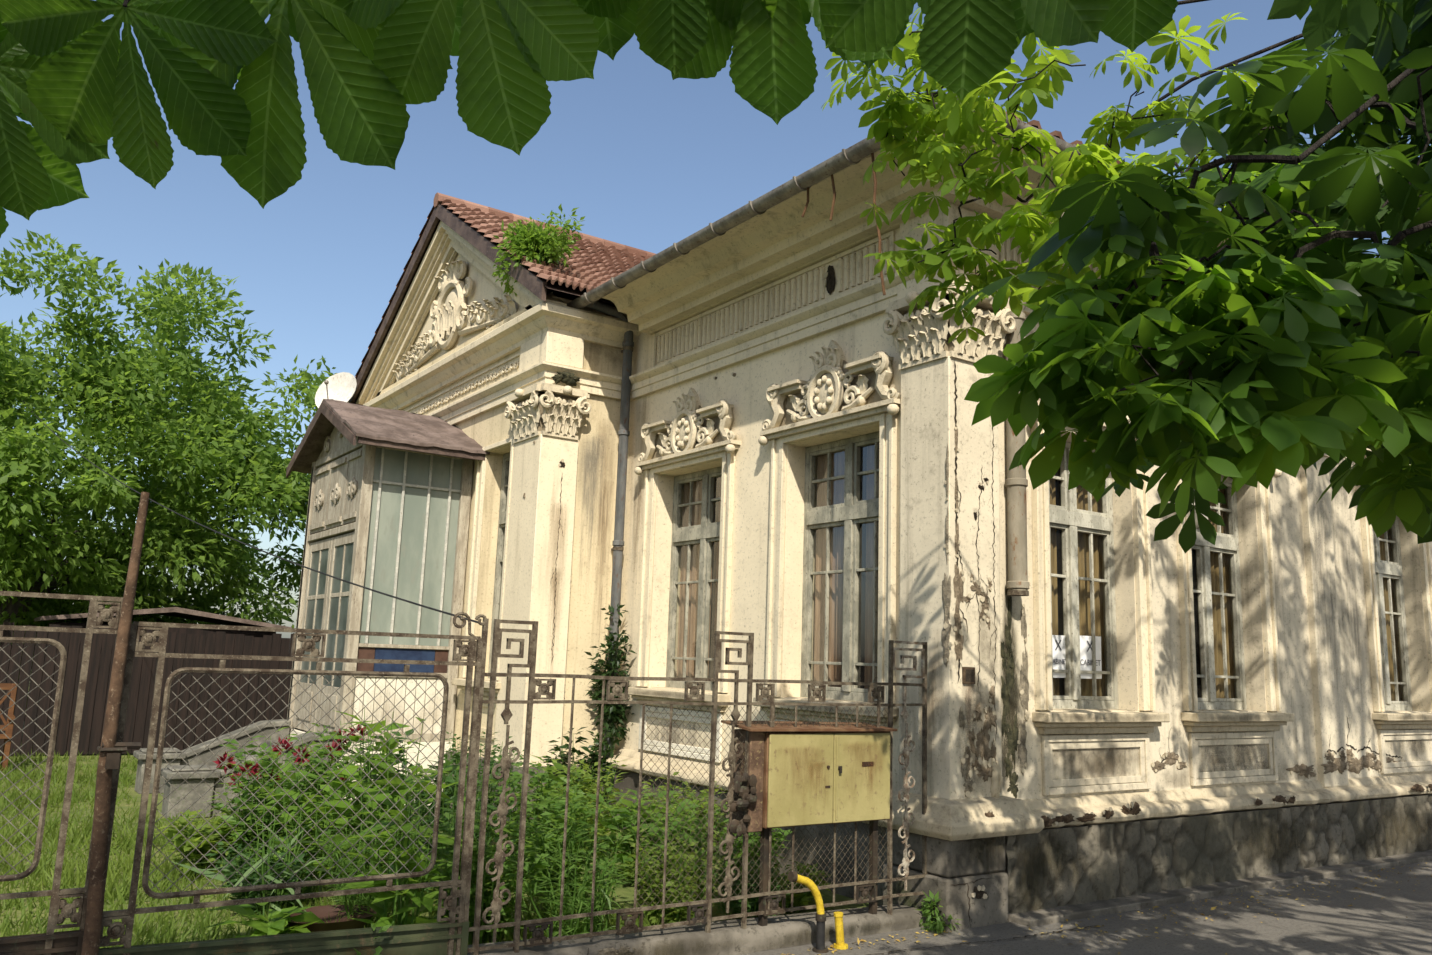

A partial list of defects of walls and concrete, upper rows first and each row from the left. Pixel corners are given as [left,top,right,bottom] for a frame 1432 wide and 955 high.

crack [954,362,997,741]
flaking render [959,685,997,798]
leakage [1003,632,1020,761]
peeling [1017,604,1030,776]